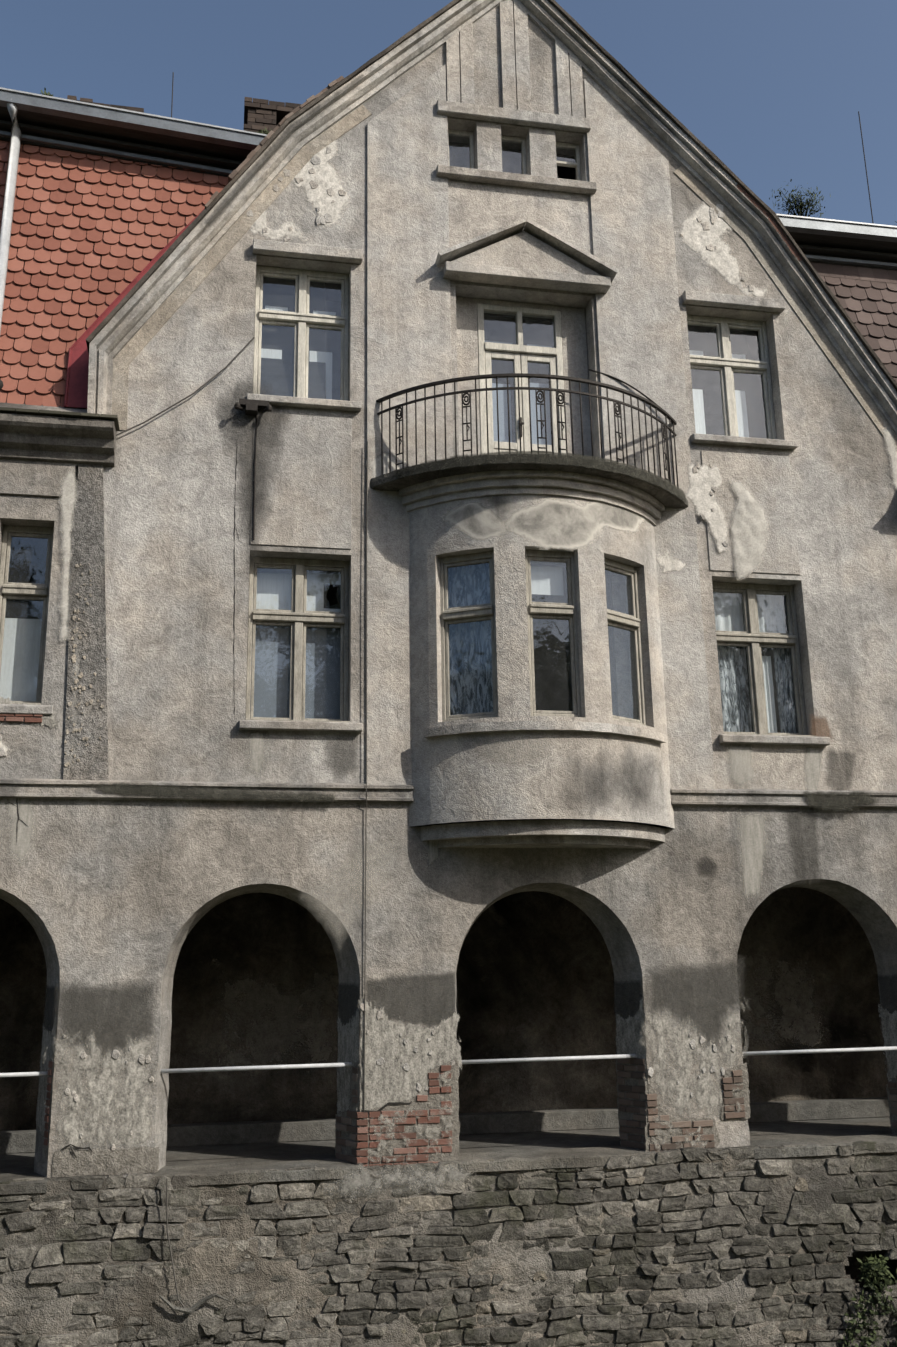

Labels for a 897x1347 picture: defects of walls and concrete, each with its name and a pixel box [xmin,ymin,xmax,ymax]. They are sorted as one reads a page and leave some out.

flaking render [246,210,307,242]
flaking render [267,140,351,226]
flaking render [679,201,767,297]
flaking render [686,462,728,552]
flaking render [0,563,104,767]
water stain [43,987,151,1064]
flaking render [36,1012,160,1178]
flaking render [214,960,462,1166]
water stain [338,974,455,1026]
water stain [614,962,741,1048]
flaking render [615,955,824,1152]
flaking render [878,1003,897,1134]